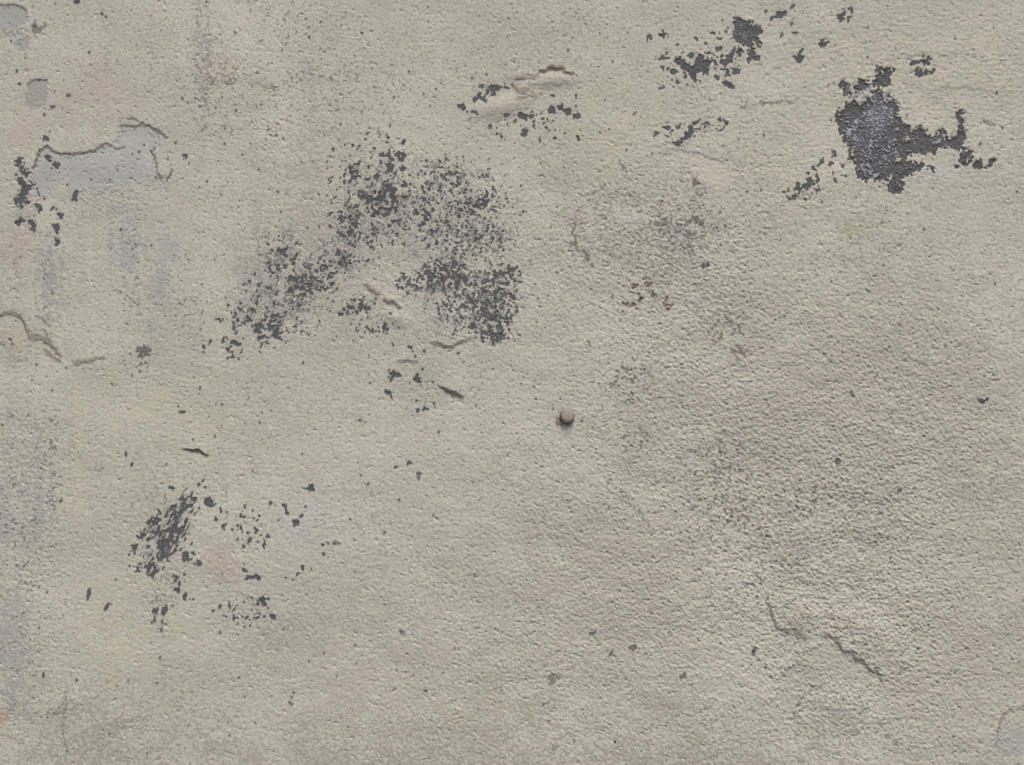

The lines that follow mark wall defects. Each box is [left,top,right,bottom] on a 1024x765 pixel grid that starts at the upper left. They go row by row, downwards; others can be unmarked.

peeling [457,80,513,115]
peeling [488,94,581,142]
peeling [653,117,729,147]
spalling [646,10,787,89]
spalling [783,65,997,203]
peeling [906,55,936,77]
peeling [13,157,64,246]
peeling [202,123,527,360]
peeling [126,486,270,629]
peeling [212,595,276,635]